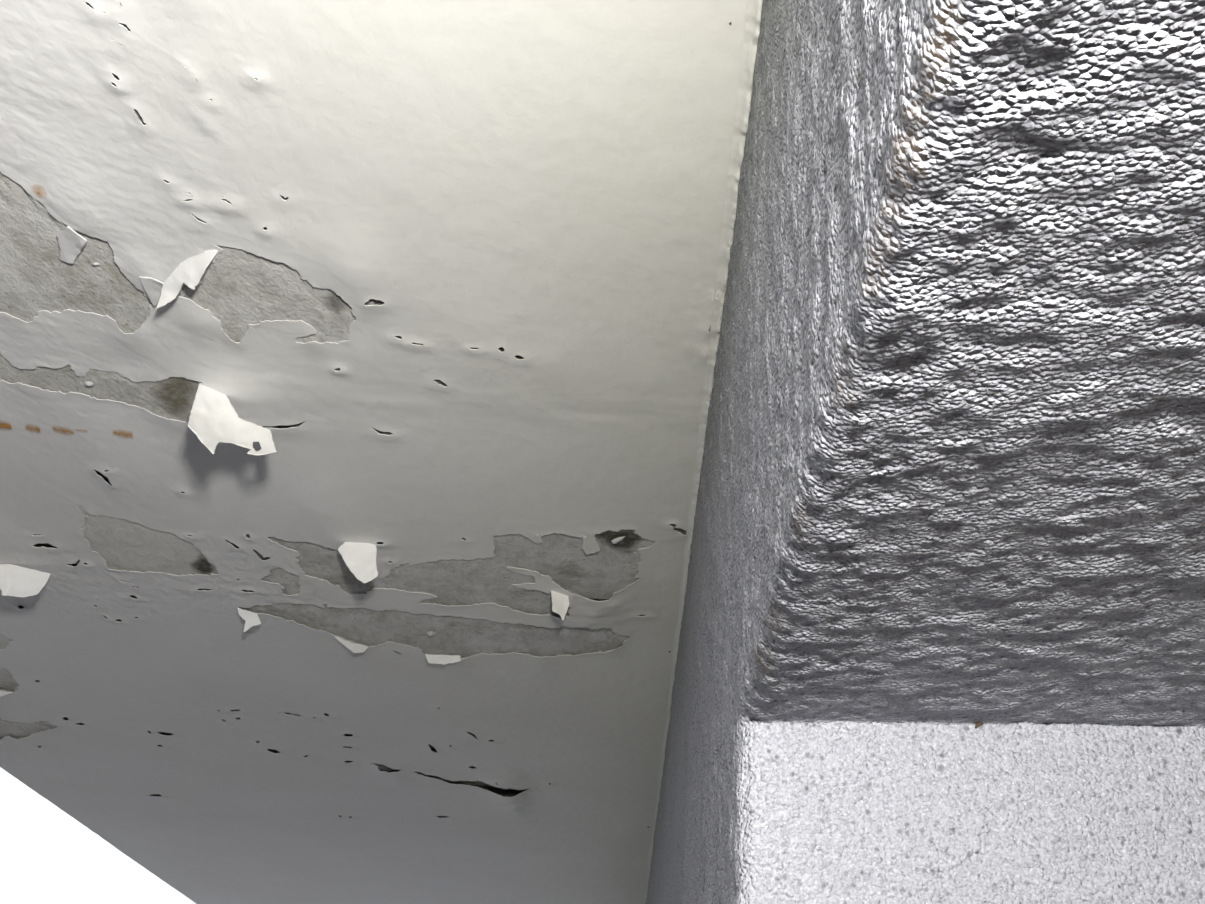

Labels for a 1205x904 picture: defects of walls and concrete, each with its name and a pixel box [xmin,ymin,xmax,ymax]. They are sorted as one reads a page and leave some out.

peeling [0,157,374,352]
peeling [0,343,210,433]
spalling [59,497,691,665]
peeling [0,664,68,744]
crack [207,702,562,820]